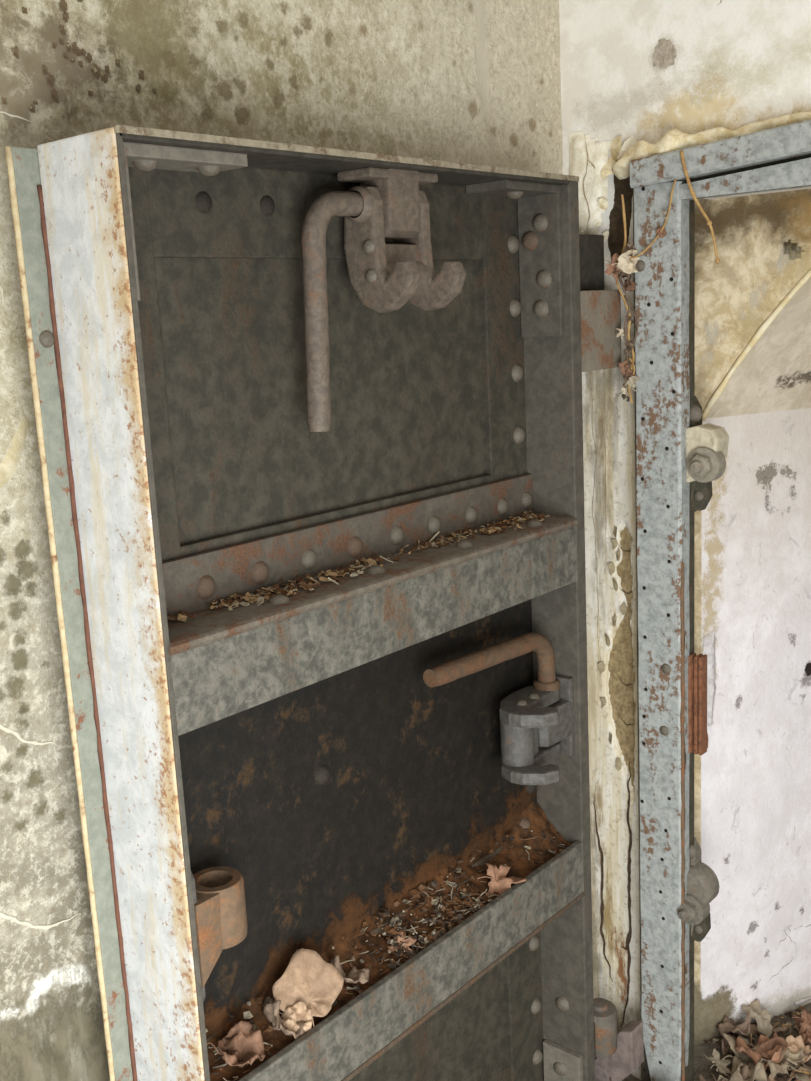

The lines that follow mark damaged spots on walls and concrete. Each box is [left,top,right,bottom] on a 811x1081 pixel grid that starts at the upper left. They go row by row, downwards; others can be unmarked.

leakage [0,14,105,132]
peeling [756,463,796,510]
peeling [777,372,811,388]
peeling [598,526,636,787]
rust [680,563,708,905]
crack [594,762,632,1028]